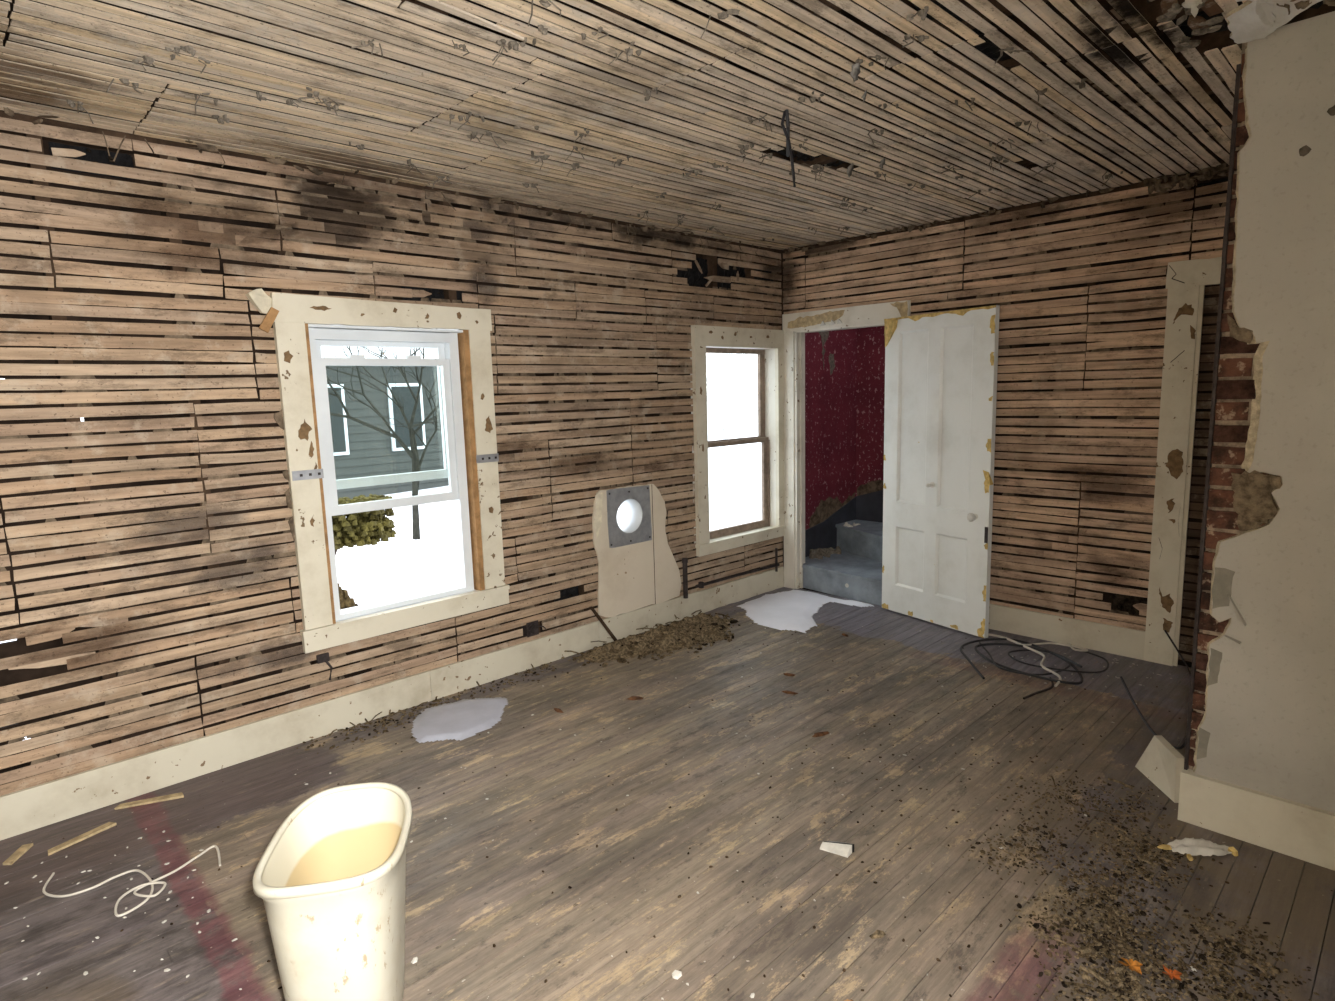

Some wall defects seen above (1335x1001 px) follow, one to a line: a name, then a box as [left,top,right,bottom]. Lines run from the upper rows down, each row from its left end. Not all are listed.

spalling [1290,0,1335,10]
peeling [1173,303,1196,339]
spalling [1188,48,1283,773]
peeling [1166,449,1183,479]
spalling [1109,588,1174,633]